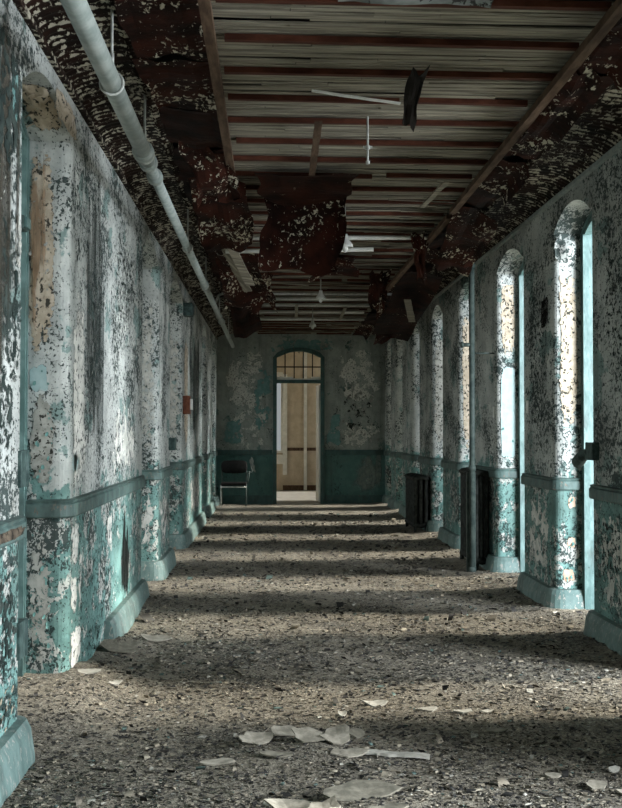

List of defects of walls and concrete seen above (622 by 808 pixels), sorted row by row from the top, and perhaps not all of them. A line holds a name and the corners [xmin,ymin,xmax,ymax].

water stain [0,25,20,360]
peeling [72,264,104,487]
water stain [87,203,104,411]
peeling [225,351,268,450]
peeling [337,350,381,447]
flaking render [500,285,515,355]
peeling [501,367,517,458]
peeling [528,260,548,443]
flaking render [559,264,579,426]
peeling [600,234,622,393]
peeling [71,519,82,613]
flaking render [71,619,101,668]